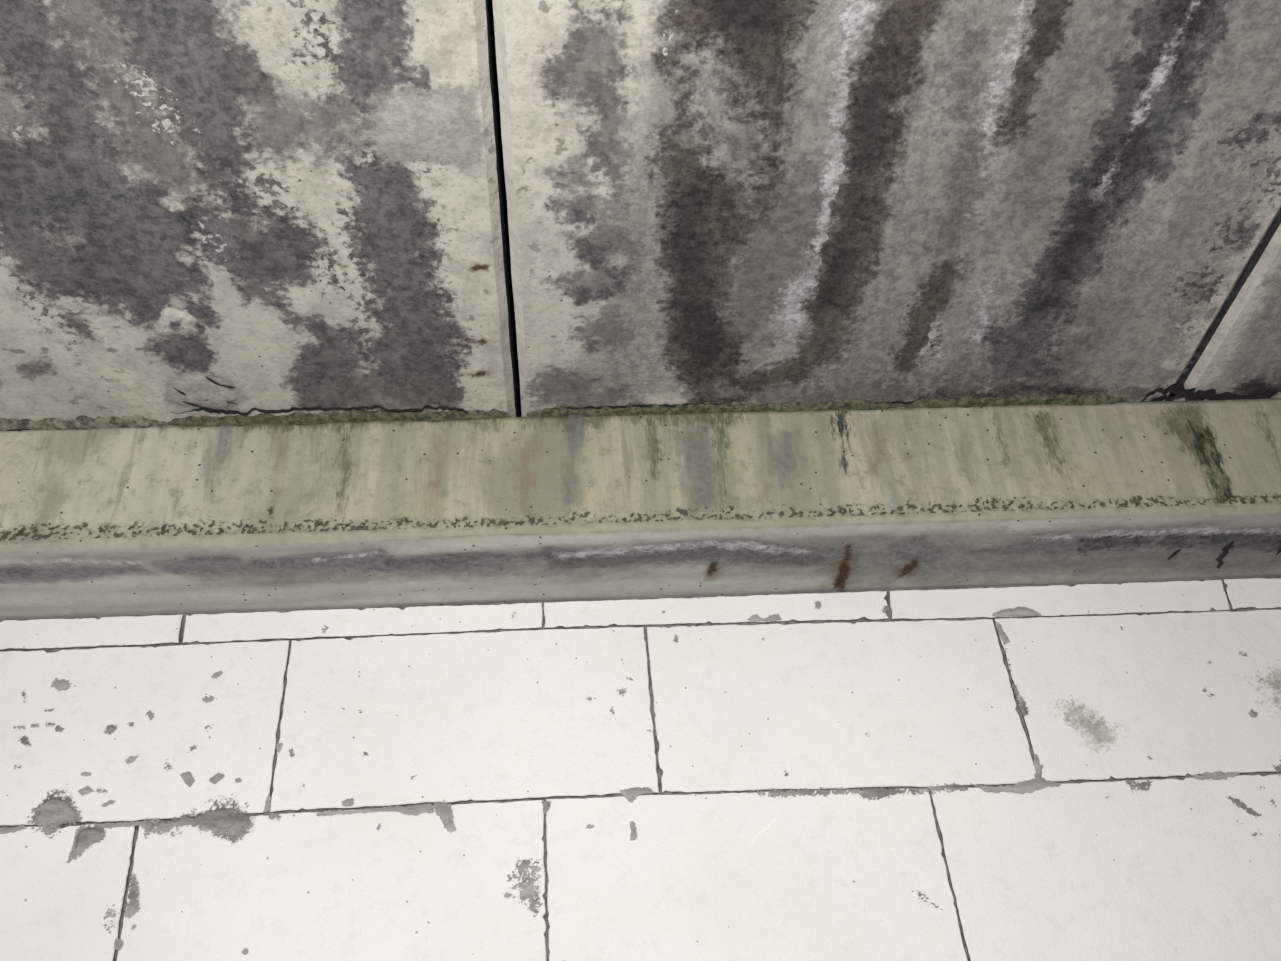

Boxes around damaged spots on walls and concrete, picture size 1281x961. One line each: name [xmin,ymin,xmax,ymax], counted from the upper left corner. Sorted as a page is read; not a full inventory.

water stain [0,0,478,414]
water stain [522,0,1281,408]
crack [173,405,468,416]
water stain [1187,422,1233,500]
rust [834,546,850,590]
peeling [47,772,115,807]
peeling [160,759,250,810]
peeling [67,819,155,863]